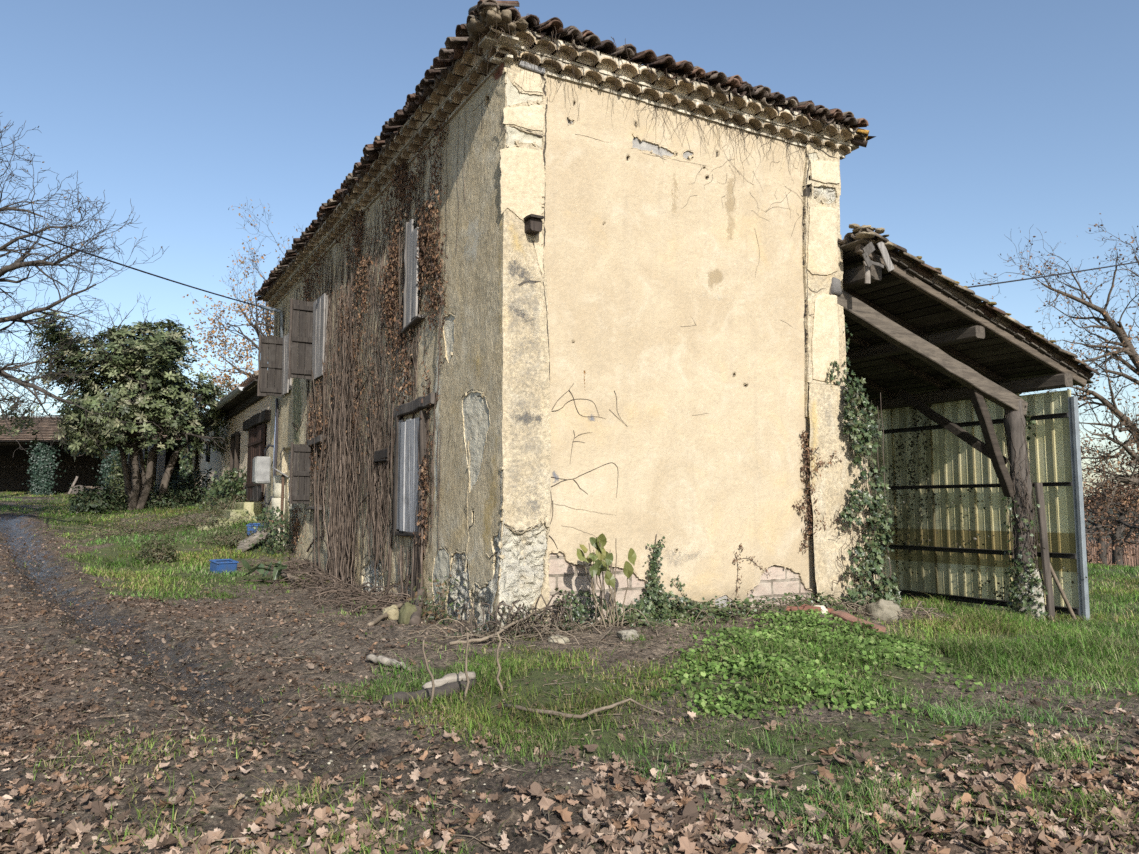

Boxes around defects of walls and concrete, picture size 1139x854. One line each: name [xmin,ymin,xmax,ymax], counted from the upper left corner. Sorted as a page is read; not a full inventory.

flaking render [506,125,544,150]
flaking render [626,121,710,180]
peeling [462,390,491,494]
spalling [445,464,665,631]
flaking render [714,563,817,608]